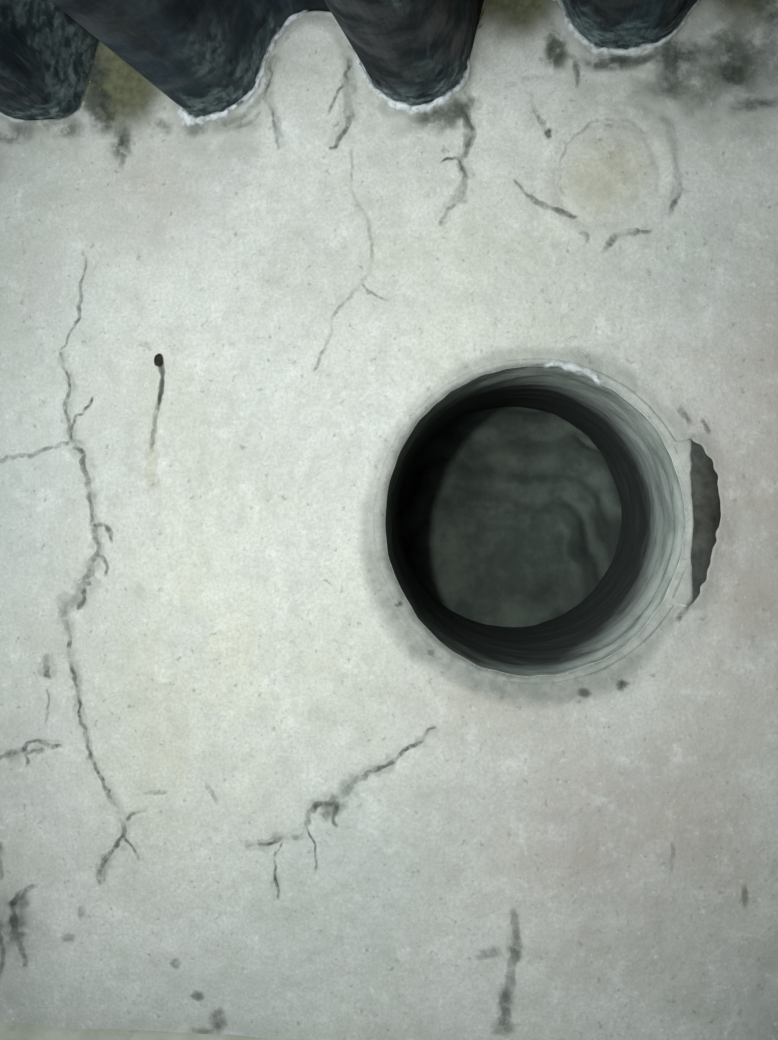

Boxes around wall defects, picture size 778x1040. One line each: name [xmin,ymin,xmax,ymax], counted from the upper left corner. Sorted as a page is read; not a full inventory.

damp [547,35,566,65]
damp [595,56,638,68]
damp [660,40,693,91]
damp [421,100,467,125]
crack [66,398,93,472]
spalling [690,440,721,603]
crack [44,643,82,717]
crack [377,744,415,770]
crack [308,803,337,849]